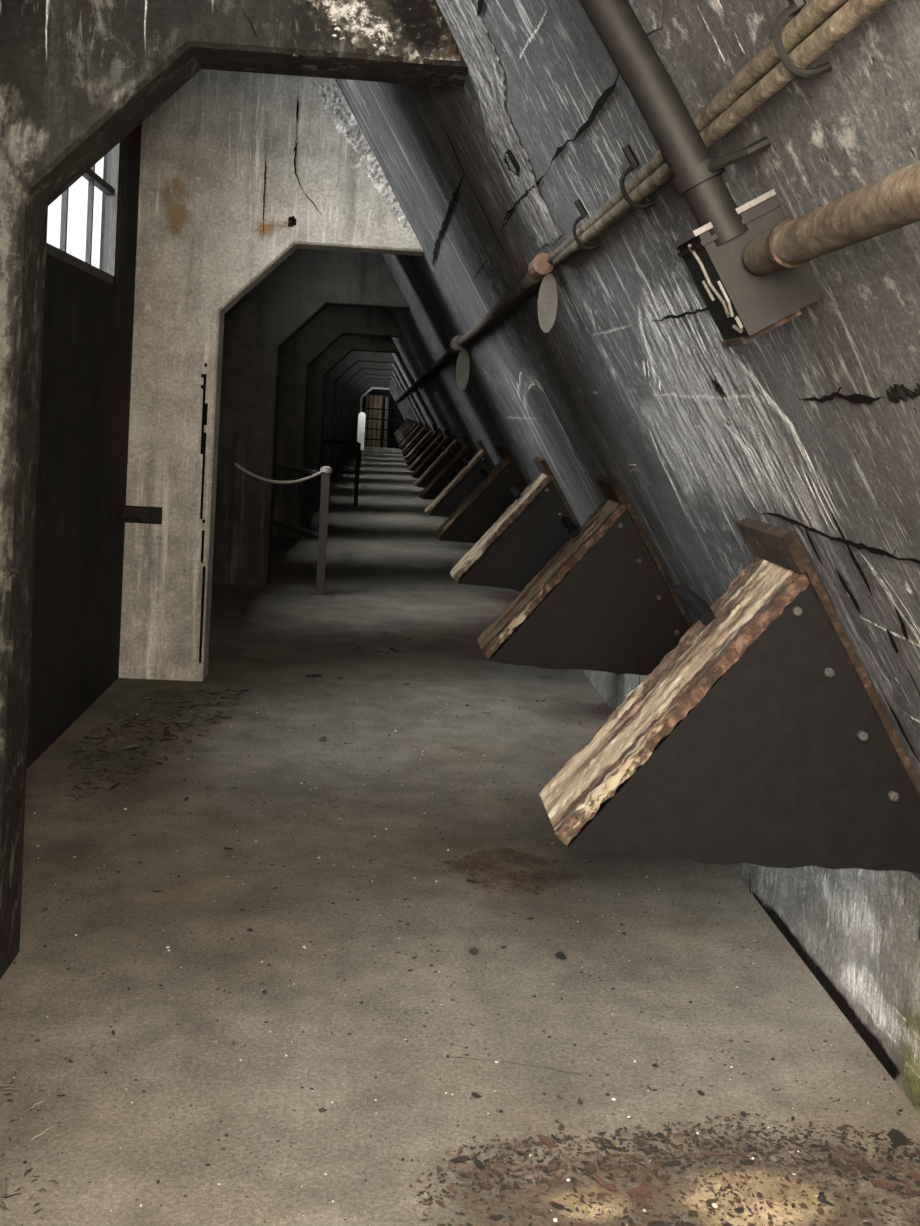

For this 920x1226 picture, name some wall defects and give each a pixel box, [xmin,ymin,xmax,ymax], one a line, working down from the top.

peeling [301,0,460,64]
crack [476,0,484,18]
water stain [310,0,562,250]
crack [500,73,620,231]
crack [432,176,464,267]
crack [799,387,885,404]
crack [759,512,920,695]
crack [884,697,920,763]
water stain [753,891,920,1080]